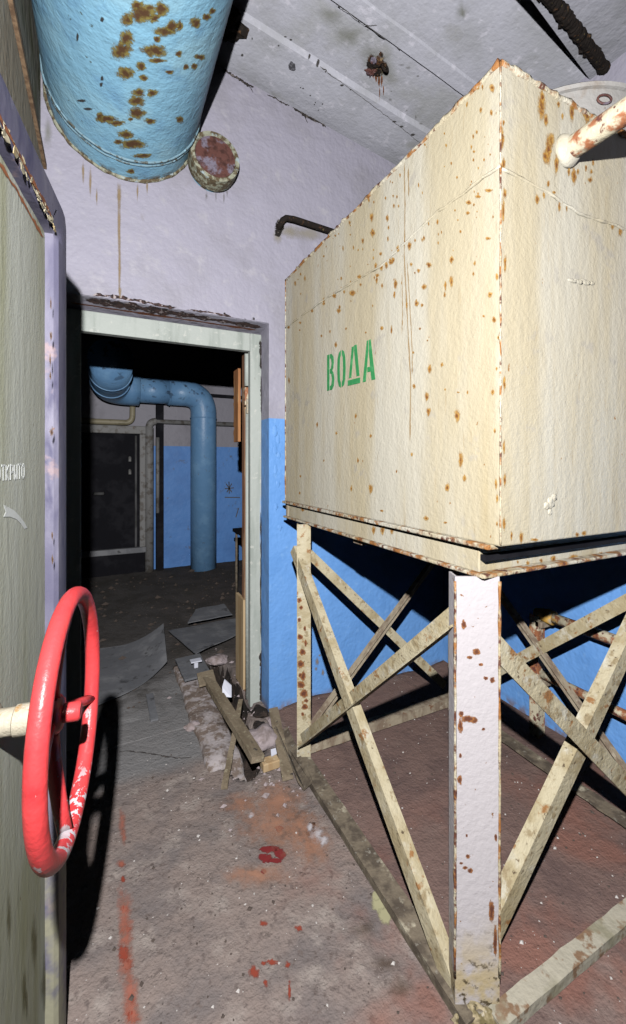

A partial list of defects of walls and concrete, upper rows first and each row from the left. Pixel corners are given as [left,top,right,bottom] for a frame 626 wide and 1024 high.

peeling [75,293,261,330]